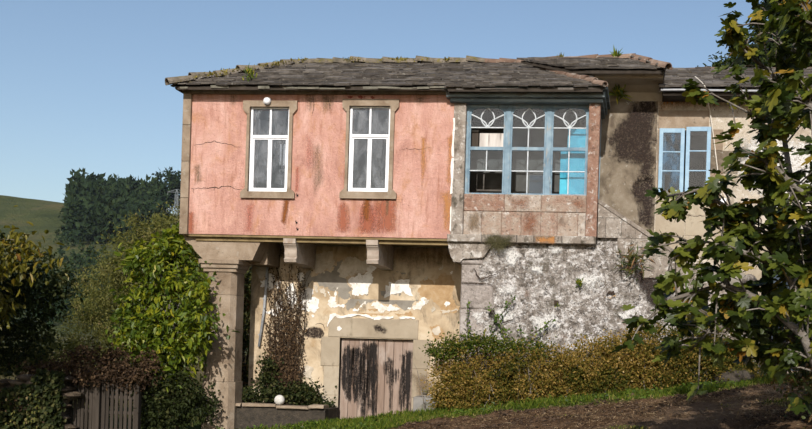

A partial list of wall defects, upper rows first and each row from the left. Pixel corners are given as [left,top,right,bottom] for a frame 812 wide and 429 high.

leakage [609,101,677,228]
corrosion [338,203,349,232]
corrosion [361,199,396,233]
peeling [256,251,460,338]